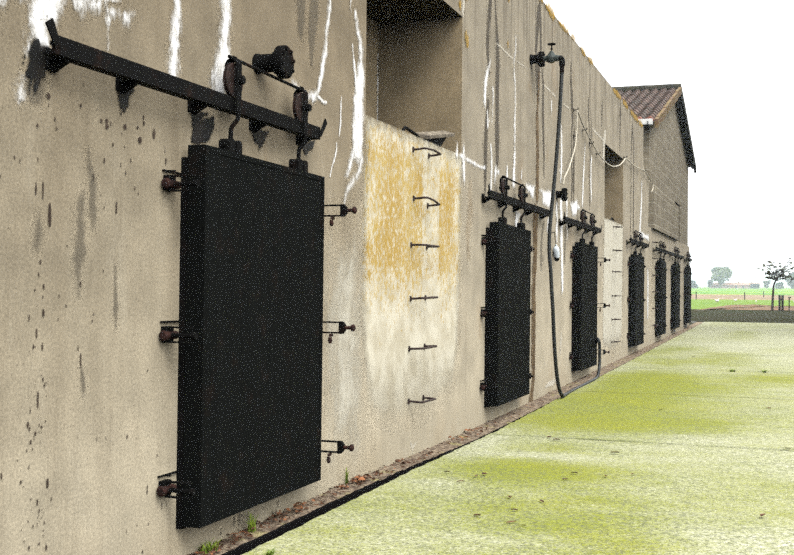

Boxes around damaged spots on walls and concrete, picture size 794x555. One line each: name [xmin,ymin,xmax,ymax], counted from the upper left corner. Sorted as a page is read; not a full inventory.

leakage [29,0,62,47]
leakage [73,0,130,25]
leakage [169,0,181,76]
leakage [211,0,231,93]
leakage [345,11,365,198]
leakage [35,182,51,227]